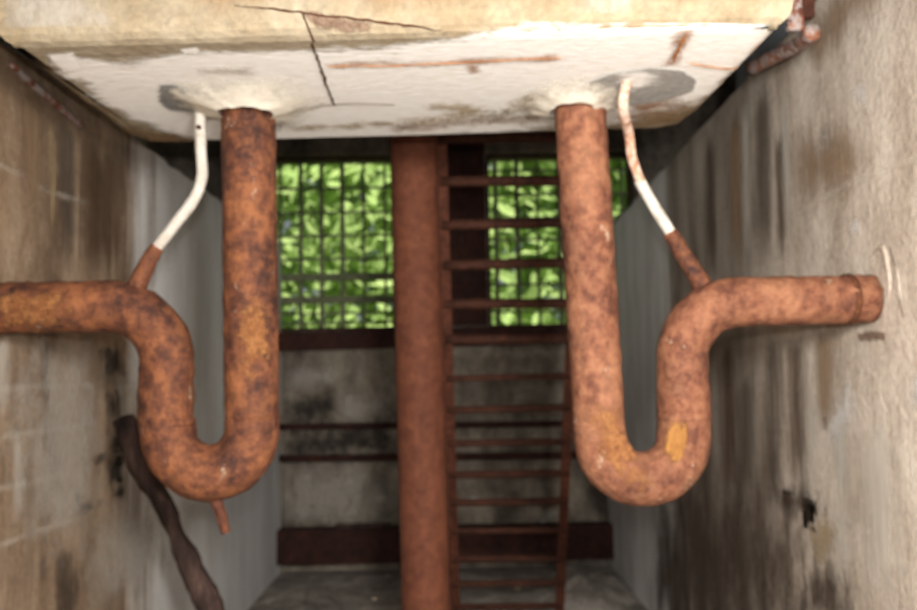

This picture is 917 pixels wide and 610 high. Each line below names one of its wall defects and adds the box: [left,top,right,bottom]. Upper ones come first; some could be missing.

crack [234,5,561,131]
leakage [60,127,74,243]
leakage [87,149,117,268]
leakage [291,396,390,455]
leakage [656,338,848,610]
leakage [57,552,79,610]